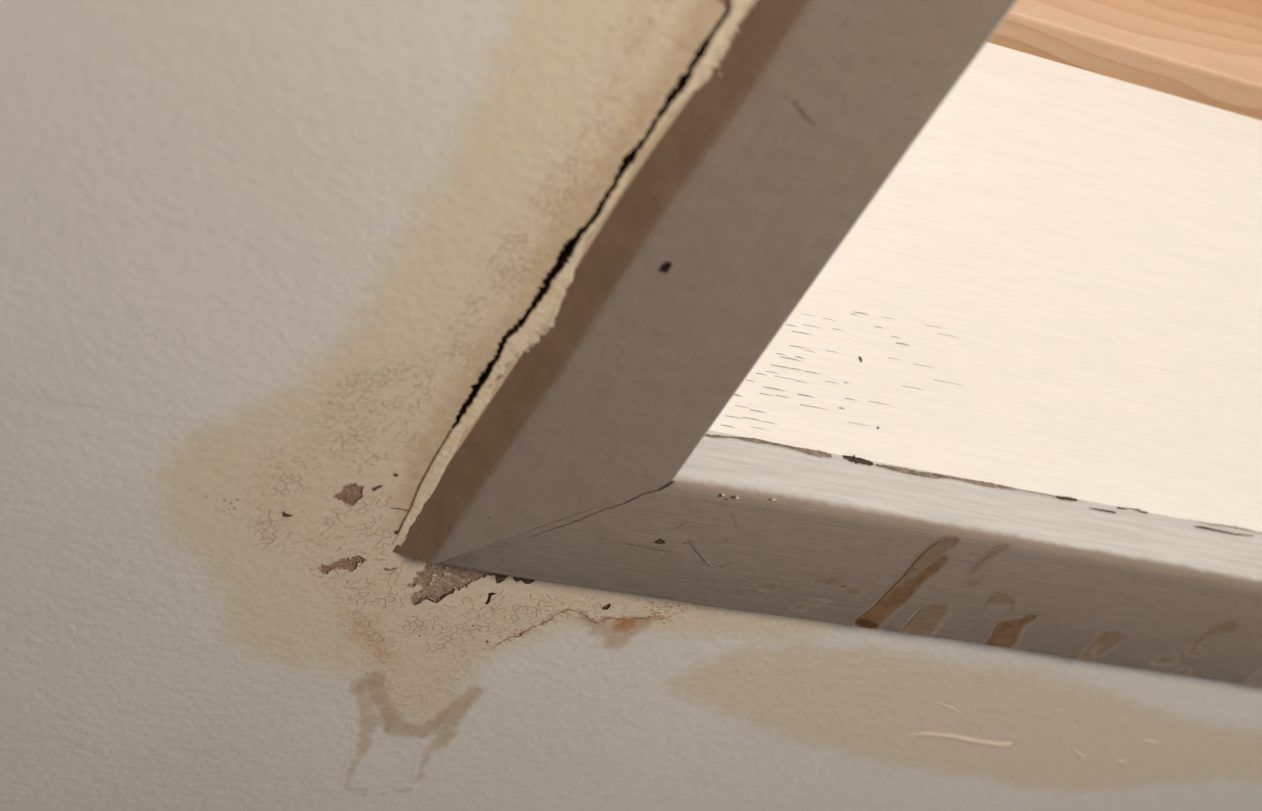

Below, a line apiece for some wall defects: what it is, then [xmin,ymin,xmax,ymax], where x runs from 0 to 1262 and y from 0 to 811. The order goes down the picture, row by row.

crack [242,4,732,656]
water stain [130,0,961,799]
peeling [393,0,756,546]
peeling [317,555,366,575]
peeling [333,483,382,506]
peeling [407,563,535,606]
water stain [977,590,1040,649]
water stain [654,627,1262,802]